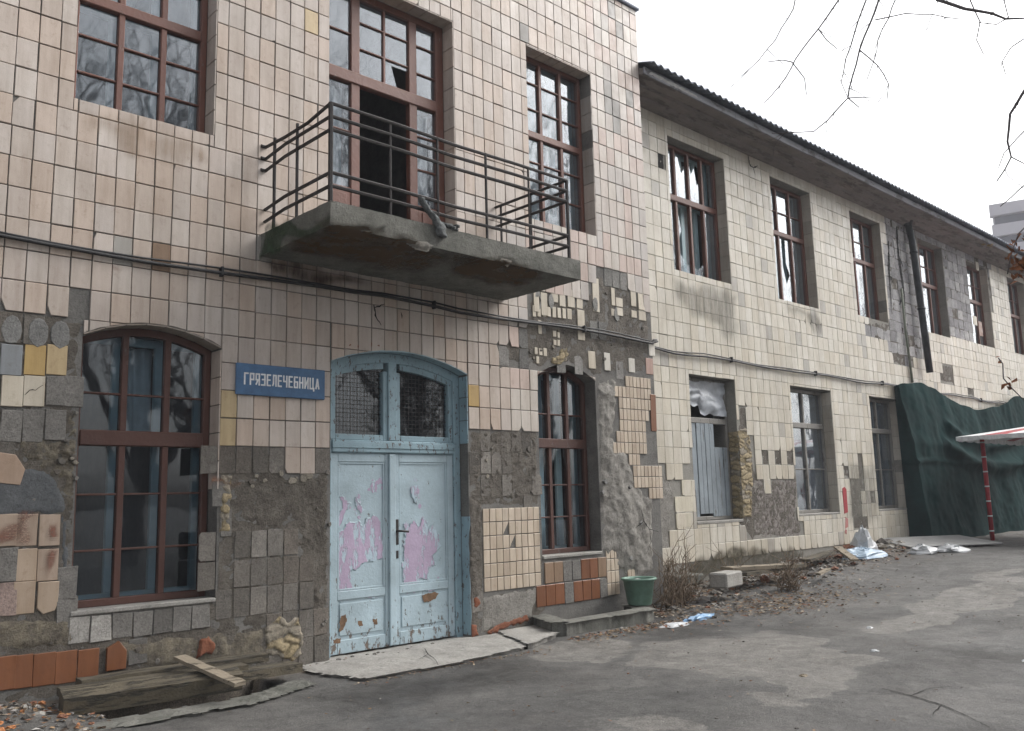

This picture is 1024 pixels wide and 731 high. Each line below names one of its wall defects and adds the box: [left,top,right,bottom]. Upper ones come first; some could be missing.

peeling [498,268,649,380]
peeling [865,217,991,367]
peeling [0,311,383,702]
peeling [401,478,441,602]
peeling [728,408,800,540]